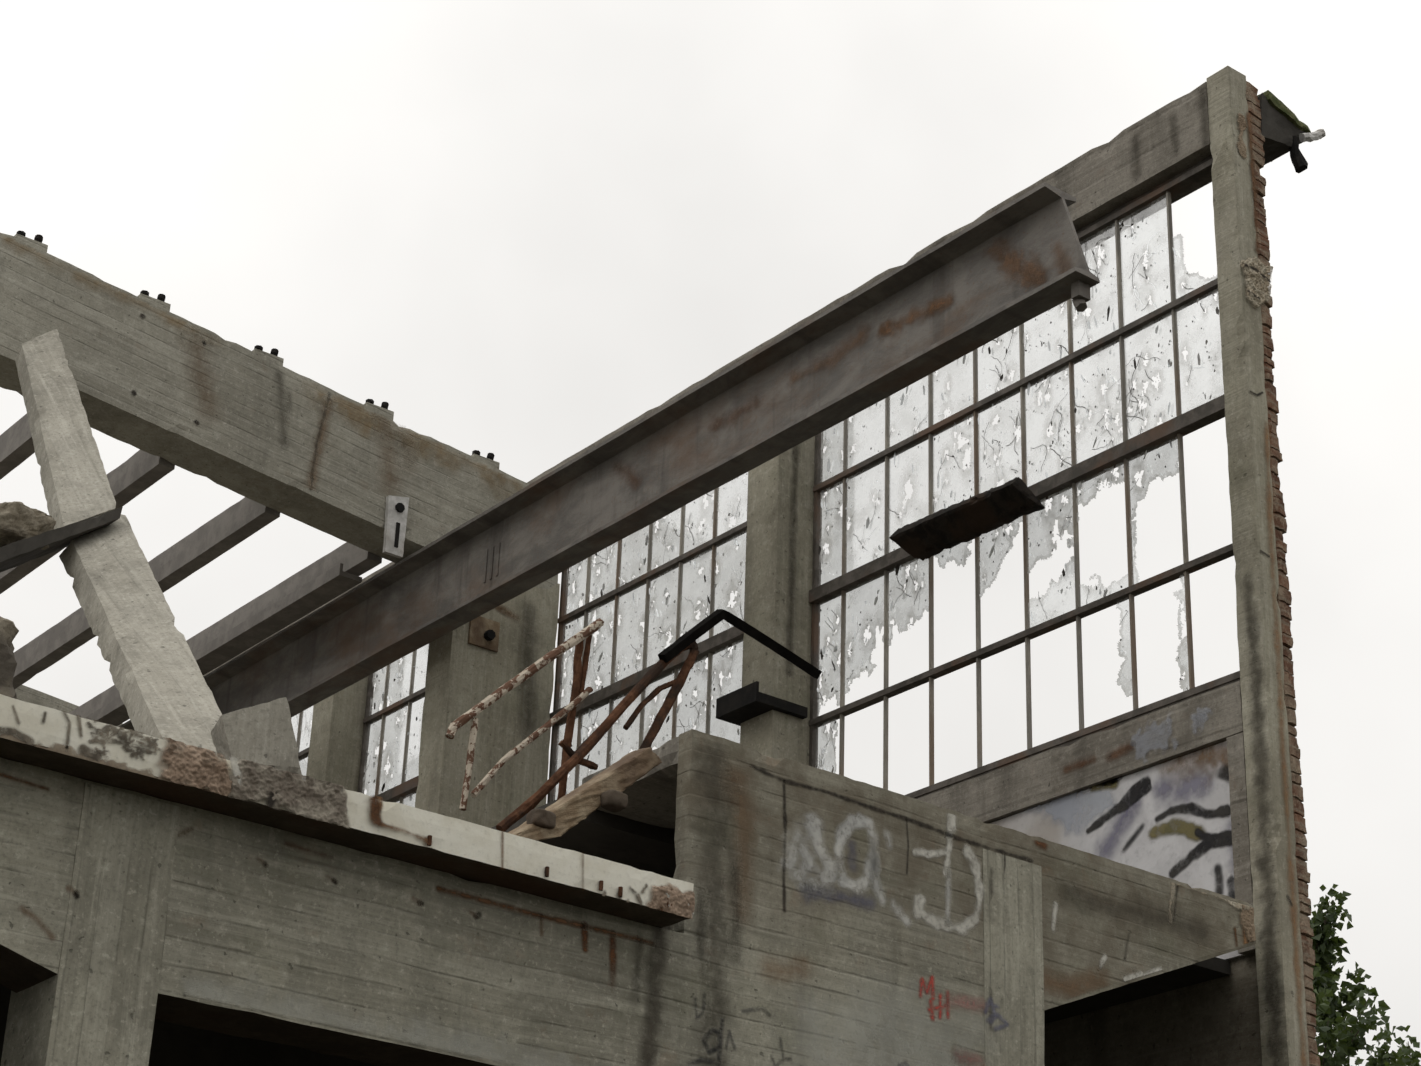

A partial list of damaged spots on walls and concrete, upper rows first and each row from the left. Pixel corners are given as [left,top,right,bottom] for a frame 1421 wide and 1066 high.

spalling [1240,257,1273,308]
spalling [0,706,350,828]
corrosion [369,796,428,844]
corrosion [436,886,654,975]